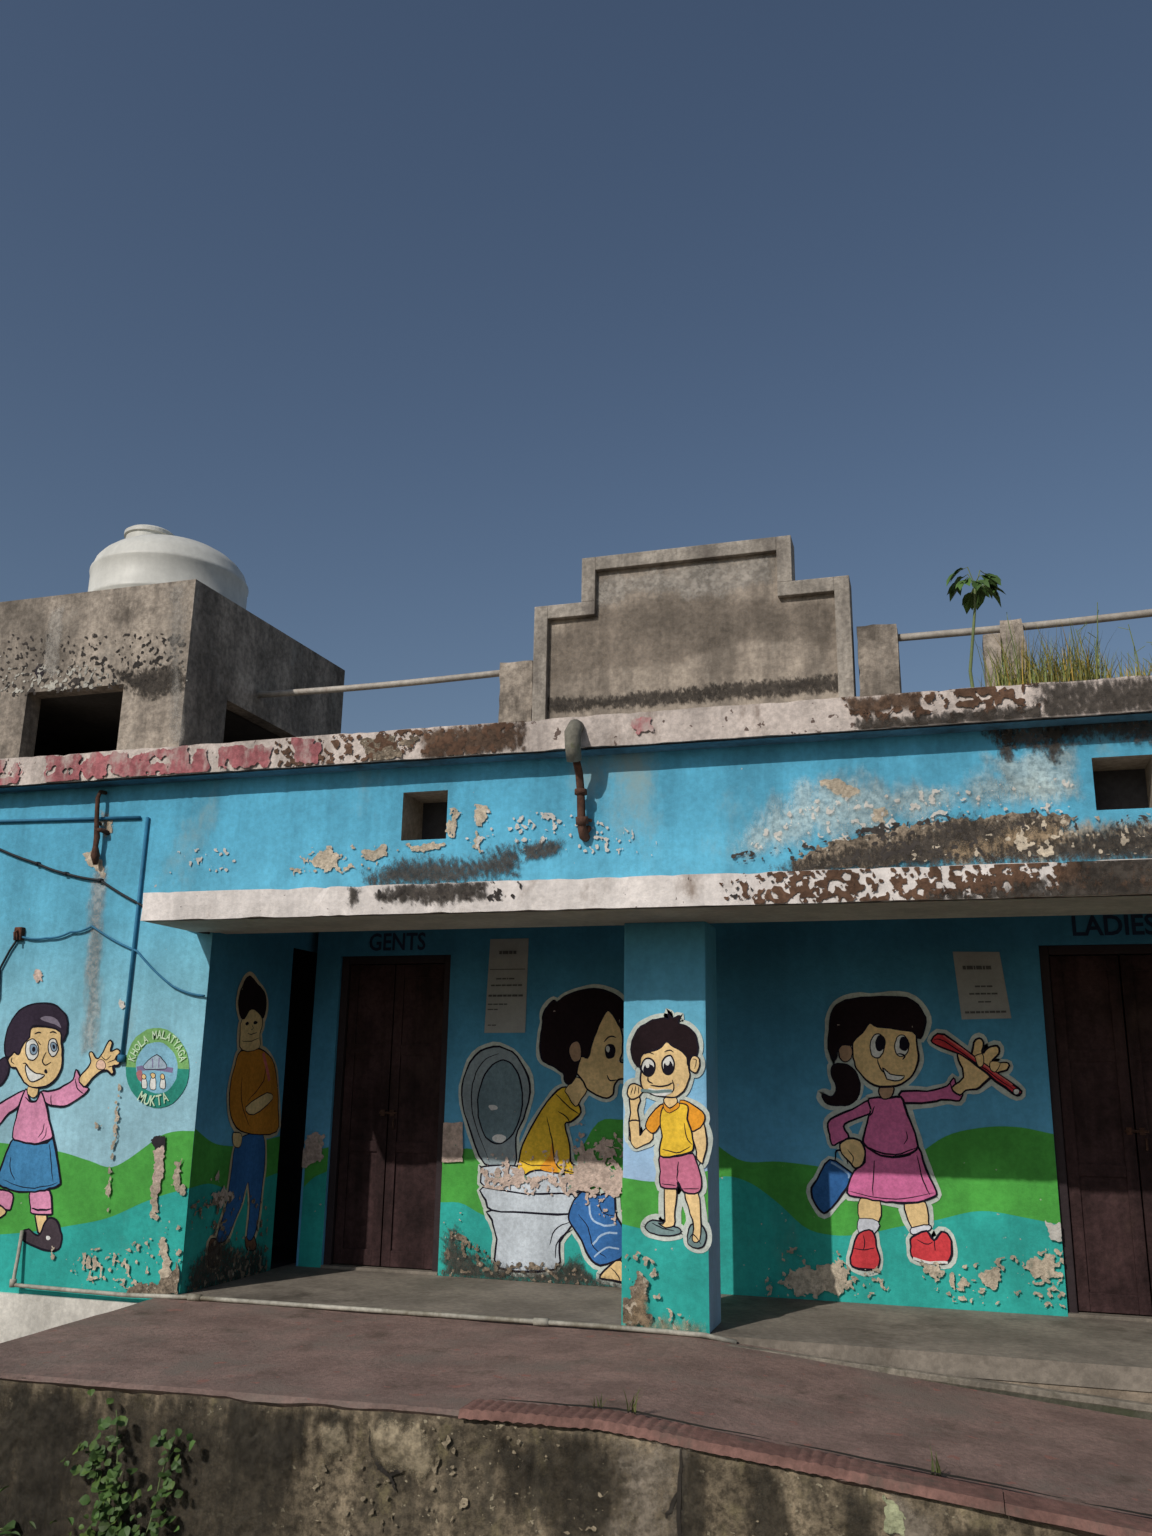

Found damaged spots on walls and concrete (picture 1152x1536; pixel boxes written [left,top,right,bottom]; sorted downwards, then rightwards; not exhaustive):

peeling [177,848,235,872]
peeling [289,804,634,875]
spalling [731,808,1152,871]